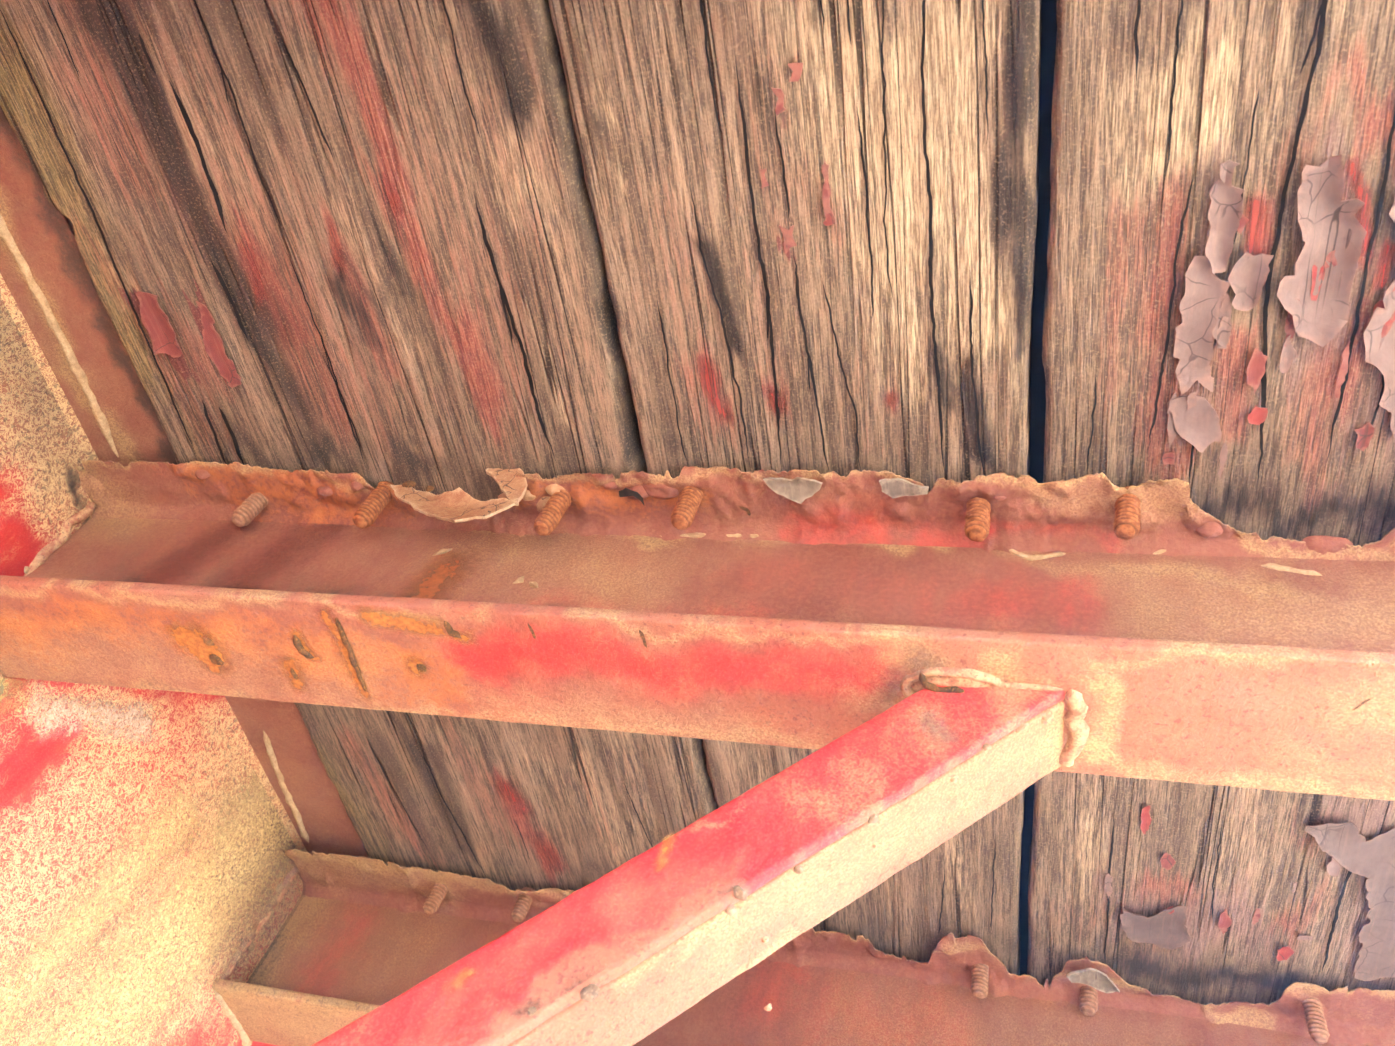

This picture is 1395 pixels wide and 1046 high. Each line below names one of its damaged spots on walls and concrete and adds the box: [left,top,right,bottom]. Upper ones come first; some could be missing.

crack [474,194,556,461]
crack [689,0,861,470]
crack [819,0,892,320]
crack [920,0,984,478]
peeling [1162,154,1395,480]
crack [1256,0,1328,491]
corrosion [283,630,321,690]
corrosion [319,610,370,699]
corrosion [403,554,466,599]
corrosion [1302,535,1353,555]
peeling [1276,935,1313,961]
peeling [1305,822,1395,981]